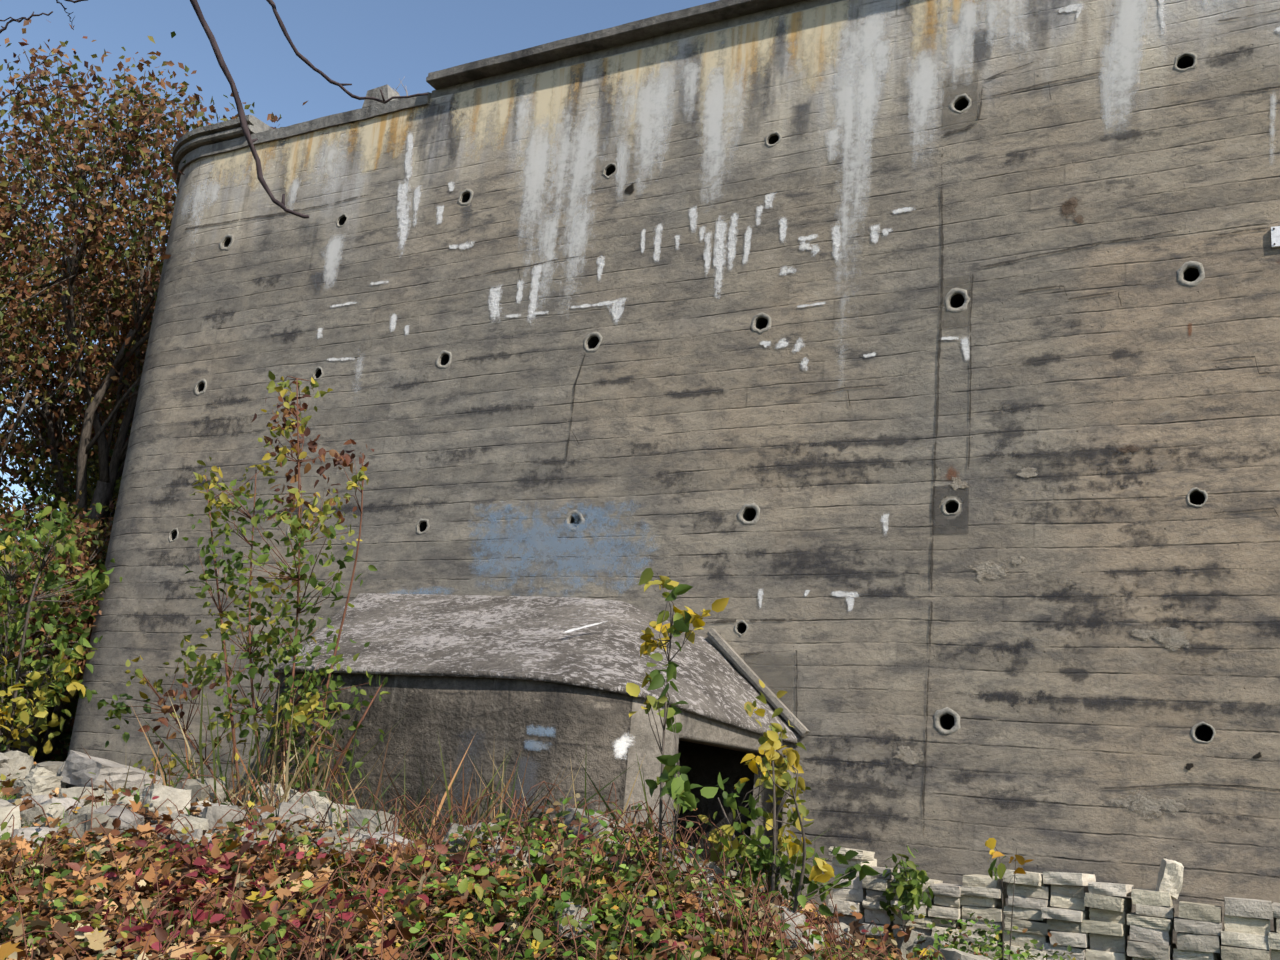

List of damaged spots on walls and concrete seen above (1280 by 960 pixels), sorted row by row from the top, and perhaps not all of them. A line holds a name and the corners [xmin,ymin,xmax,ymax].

corrosion [212,106,421,192]
leakage [397,97,460,254]
corrosion [453,63,584,168]
leakage [488,23,786,323]
corrosion [602,41,677,147]
corrosion [698,0,849,142]
leakage [641,14,913,298]
corrosion [911,0,977,62]
crack [566,355,585,458]
leakage [760,338,808,369]
crack [922,62,1178,830]
leakage [981,668,1271,714]